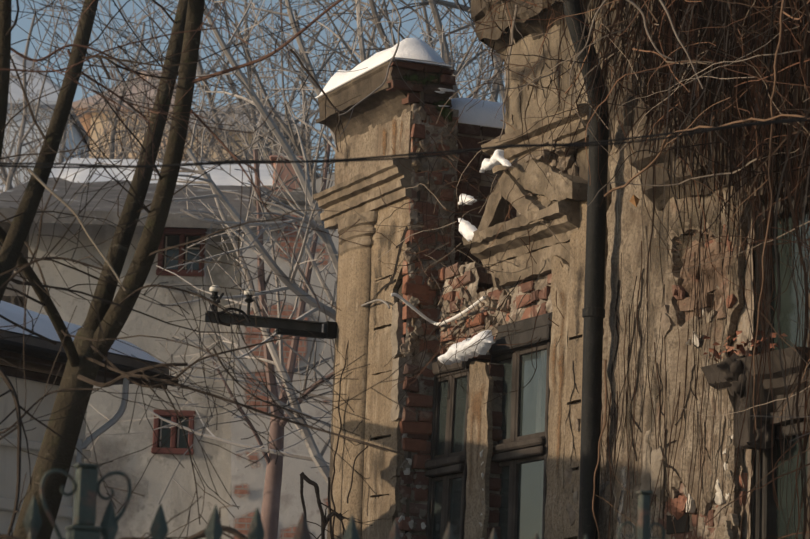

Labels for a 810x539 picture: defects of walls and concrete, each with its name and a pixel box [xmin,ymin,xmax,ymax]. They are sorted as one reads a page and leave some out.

peeling [389,219,511,539]
peeling [686,331,700,347]
spalling [660,224,737,338]
flaking render [655,412,747,539]